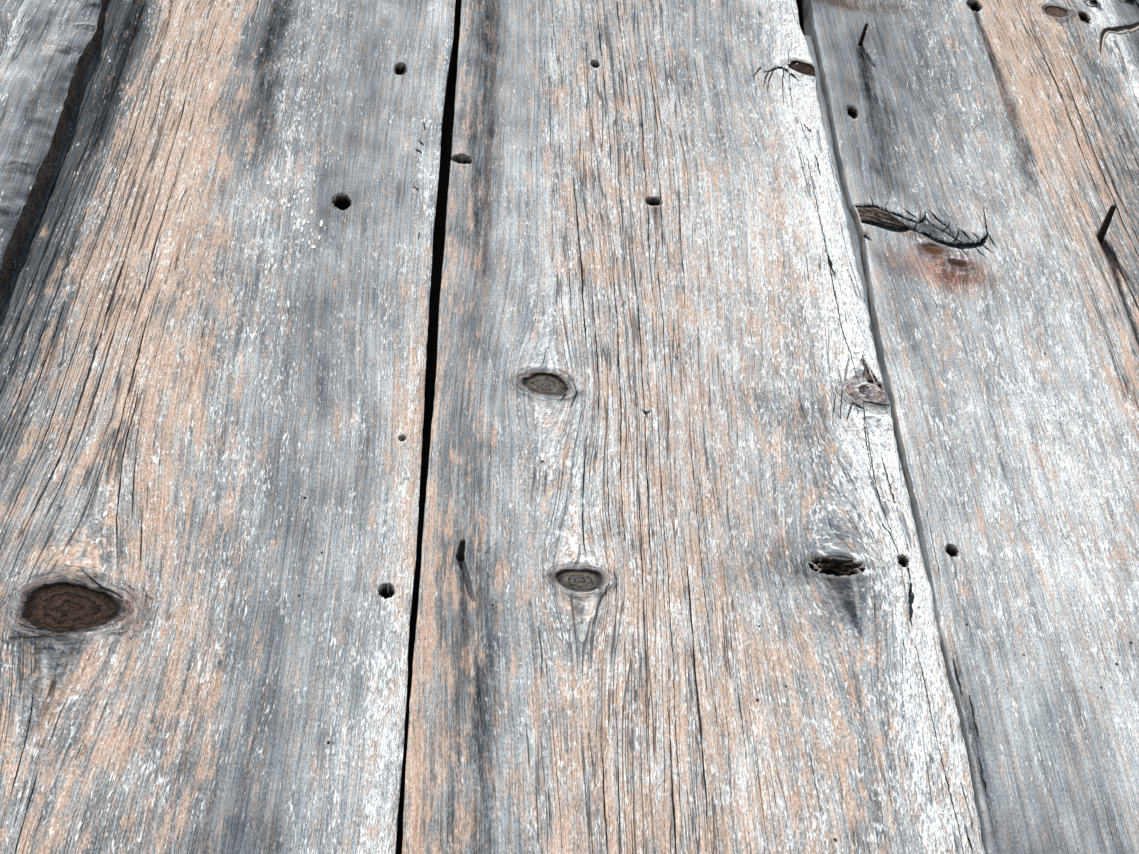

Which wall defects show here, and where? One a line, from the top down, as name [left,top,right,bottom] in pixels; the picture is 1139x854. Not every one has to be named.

crack [753,67,997,854]
crack [1000,0,1139,309]